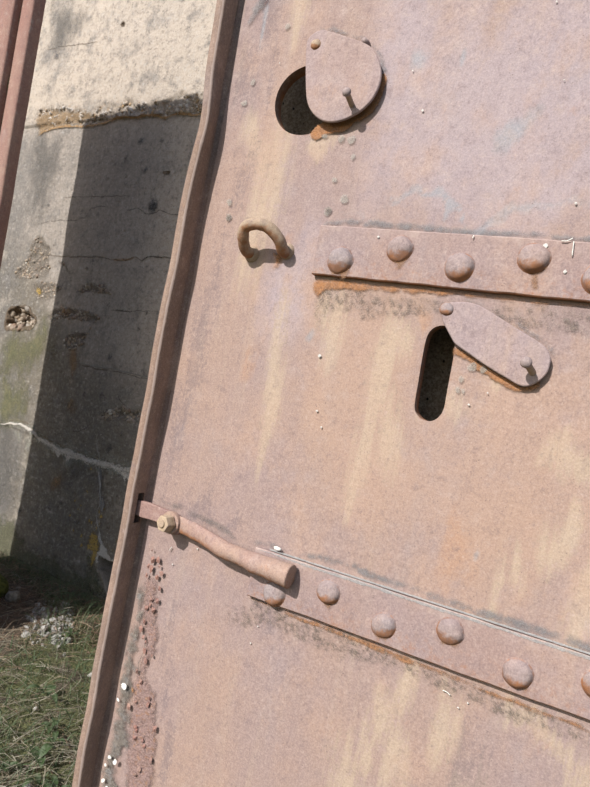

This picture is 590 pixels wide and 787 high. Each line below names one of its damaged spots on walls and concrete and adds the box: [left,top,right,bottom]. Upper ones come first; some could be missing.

corrosion [310,73,387,140]
spalling [15,235,61,300]
corrosion [313,269,447,296]
spalling [4,305,37,331]
spalling [48,307,100,351]
crack [1,419,131,545]
spalling [96,543,114,596]
corrosion [126,549,163,787]